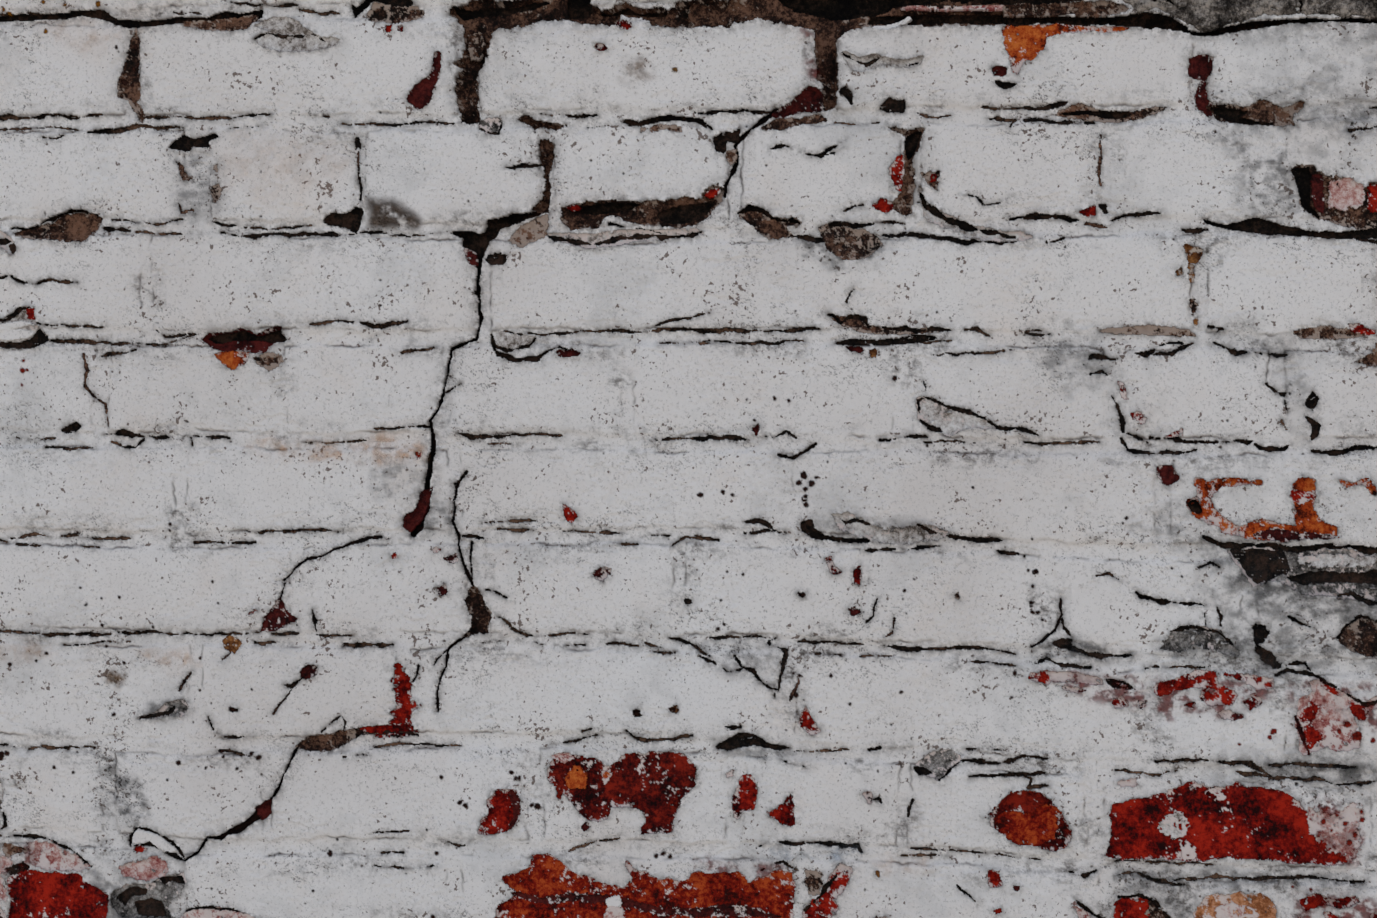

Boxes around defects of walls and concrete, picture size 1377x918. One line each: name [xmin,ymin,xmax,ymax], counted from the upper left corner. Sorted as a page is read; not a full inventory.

peeling [407,0,1377,135]
crack [917,105,1023,127]
spalling [737,97,1167,260]
crack [0,113,1311,861]
spalling [1156,465,1377,657]
crack [374,830,466,869]
peeling [546,751,697,835]
peeling [495,853,853,918]
crack [900,798,1041,902]
peeling [1068,778,1364,878]
crack [1114,859,1365,886]
crack [1114,758,1375,786]